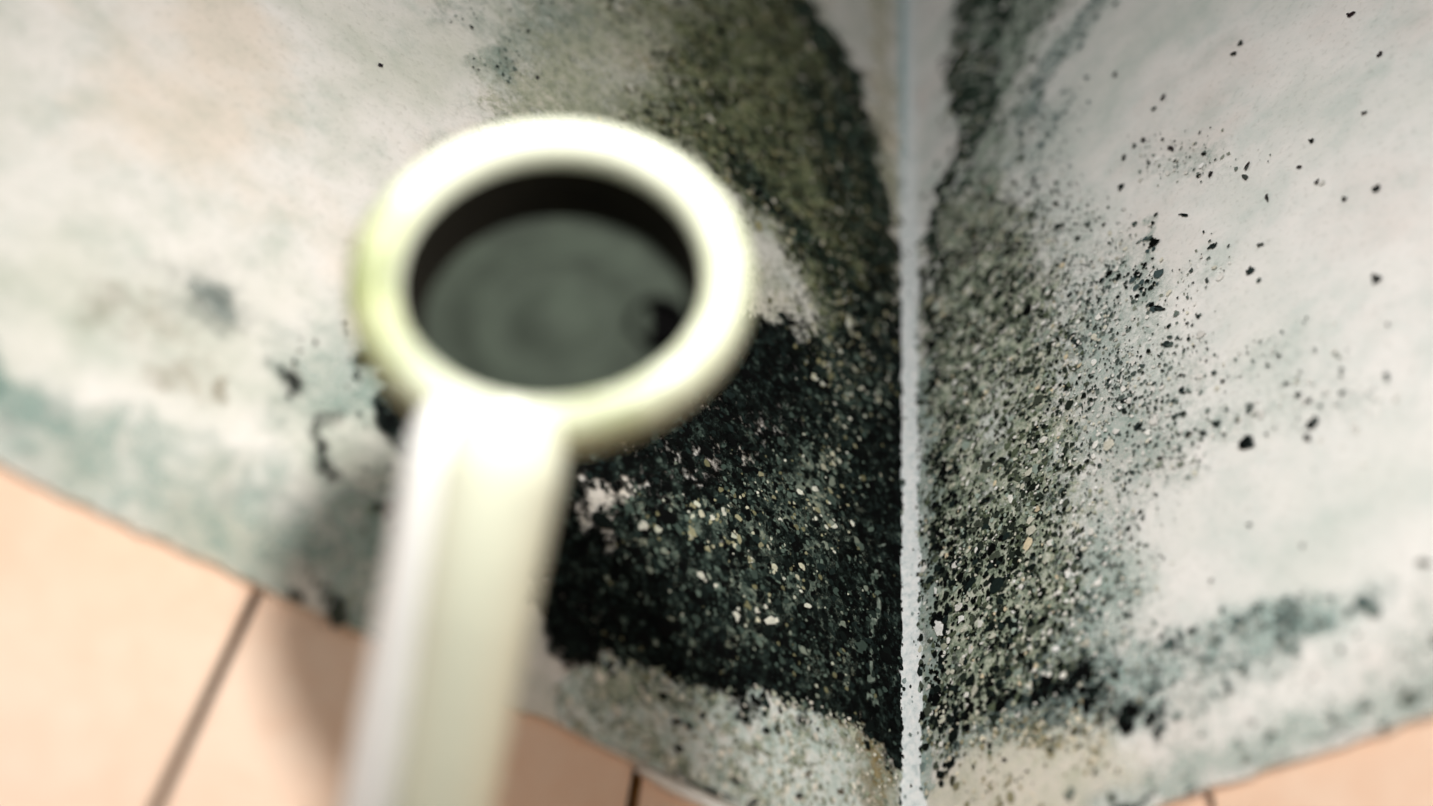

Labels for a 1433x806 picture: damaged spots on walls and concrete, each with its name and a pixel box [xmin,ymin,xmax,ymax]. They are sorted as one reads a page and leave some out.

damp [473,0,1433,806]